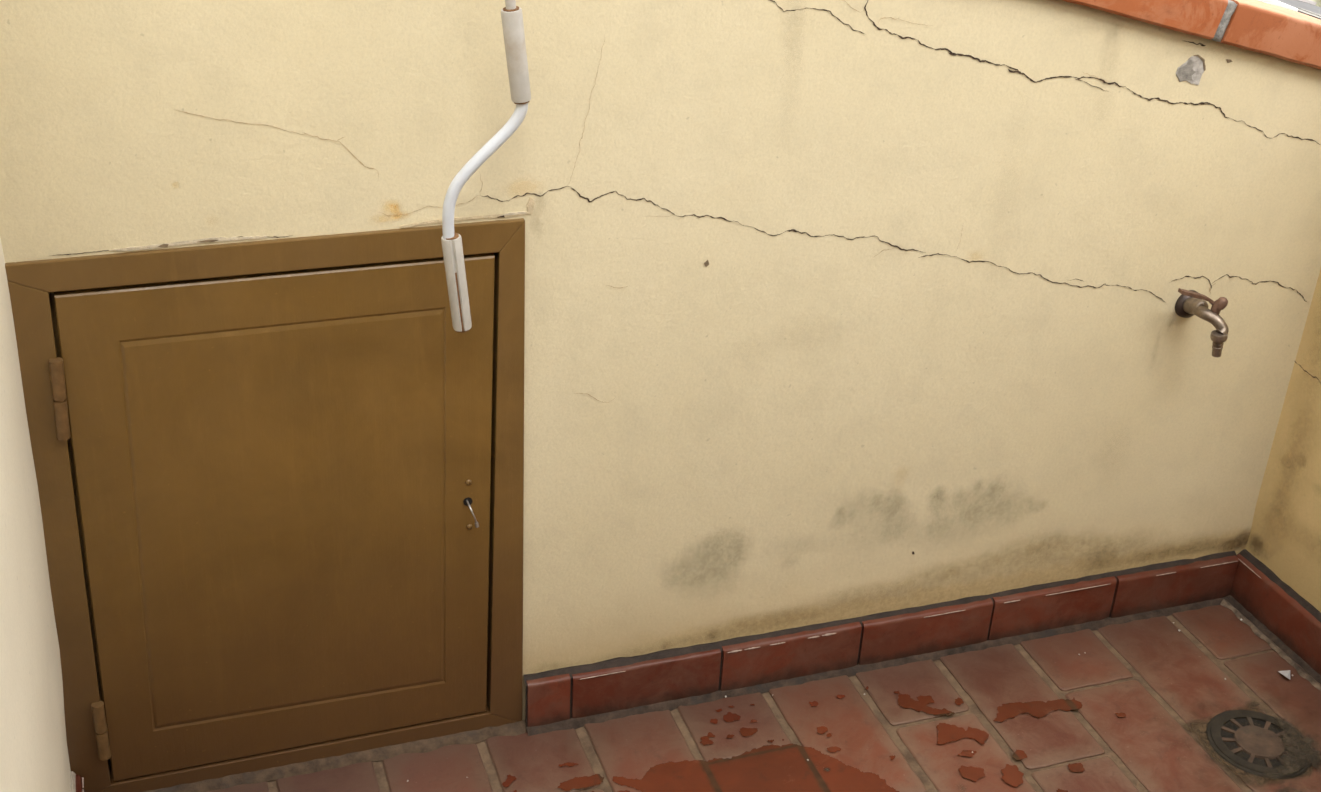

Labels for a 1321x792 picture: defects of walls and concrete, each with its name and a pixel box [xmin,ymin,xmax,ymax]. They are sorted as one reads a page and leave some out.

crack [770,0,1321,145]
peeling [1176,55,1206,85]
crack [177,110,379,175]
crack [383,41,1307,302]
damp [557,704,899,792]
damp [894,691,1082,787]